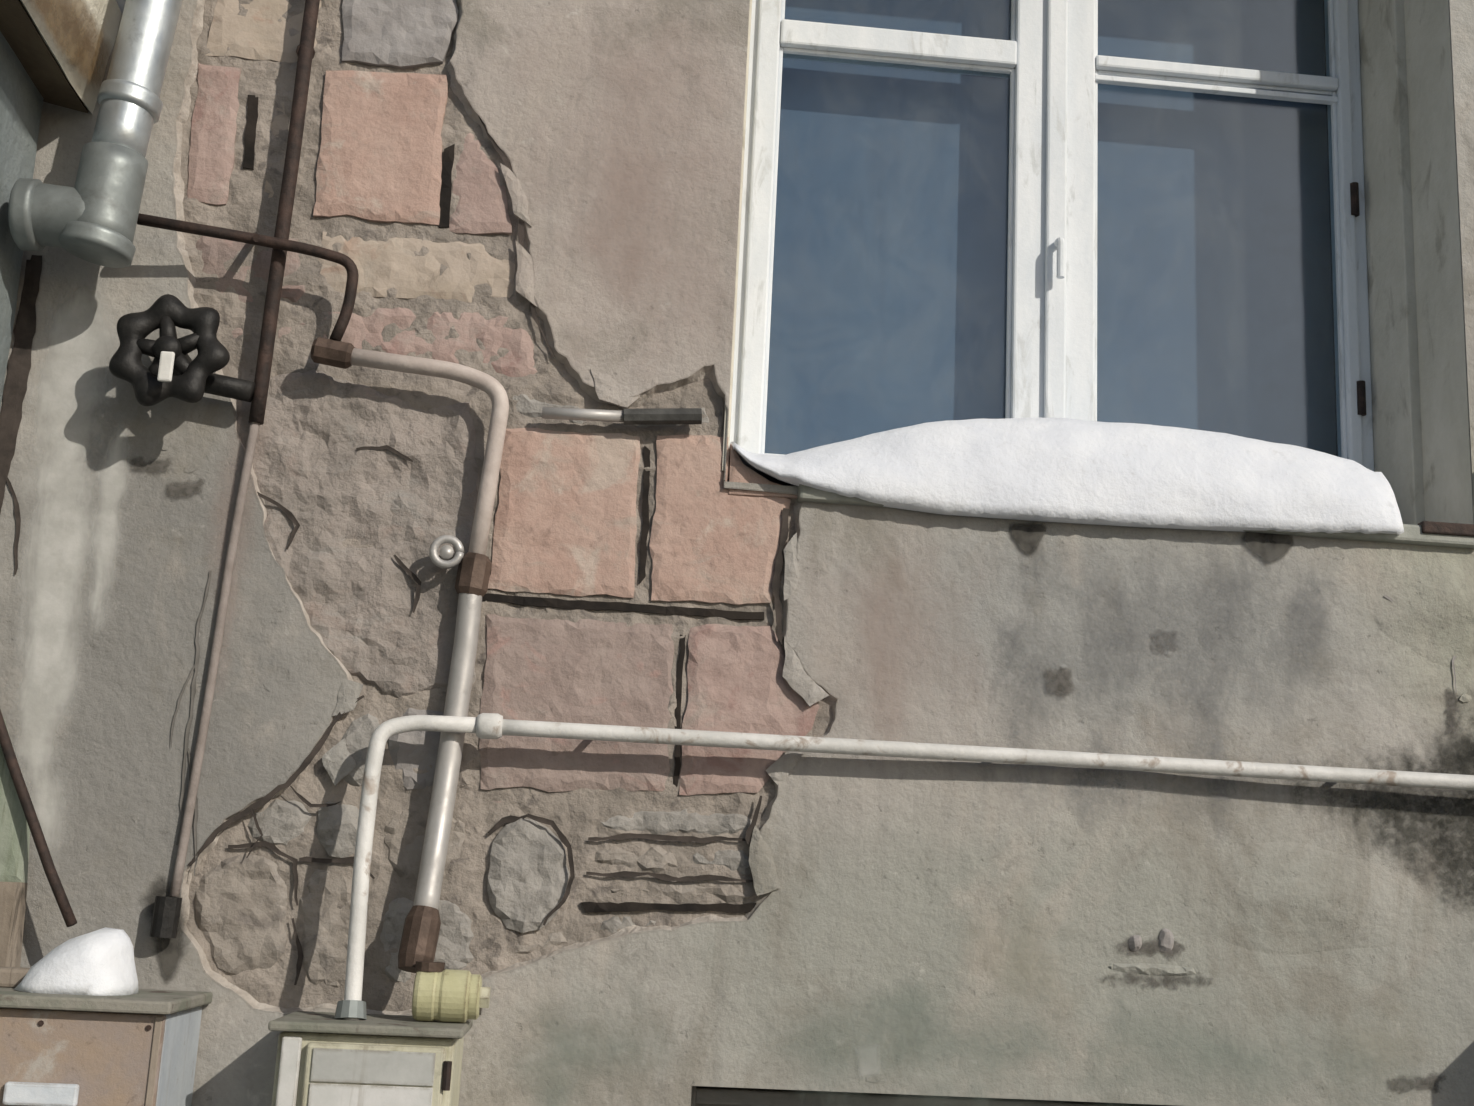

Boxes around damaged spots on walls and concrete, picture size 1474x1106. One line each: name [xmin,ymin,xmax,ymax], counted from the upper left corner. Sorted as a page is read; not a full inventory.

water stain [19,289,125,846]
spalling [172,0,838,1015]
water stain [1363,733,1474,899]